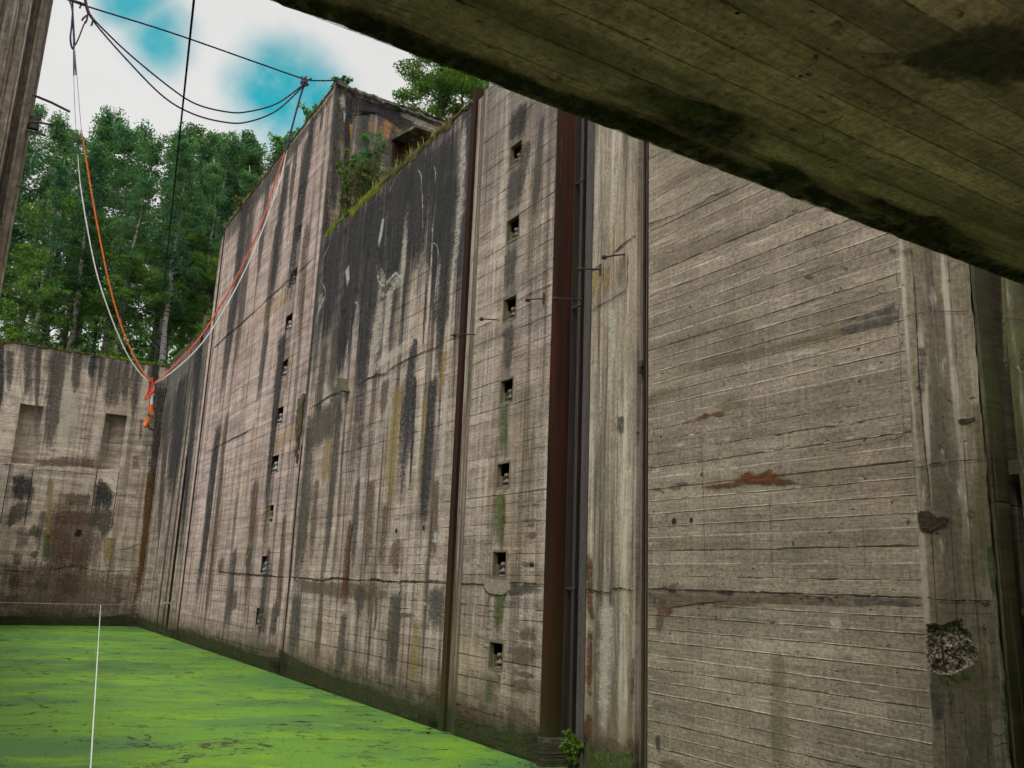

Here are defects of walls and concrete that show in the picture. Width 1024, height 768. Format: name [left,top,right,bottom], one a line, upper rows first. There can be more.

leakage [871,21,1024,84]
leakage [196,95,466,675]
leakage [0,344,202,617]
corrosion [700,470,794,489]
spalling [907,510,949,532]
crack [218,571,493,630]
spalling [925,619,980,713]